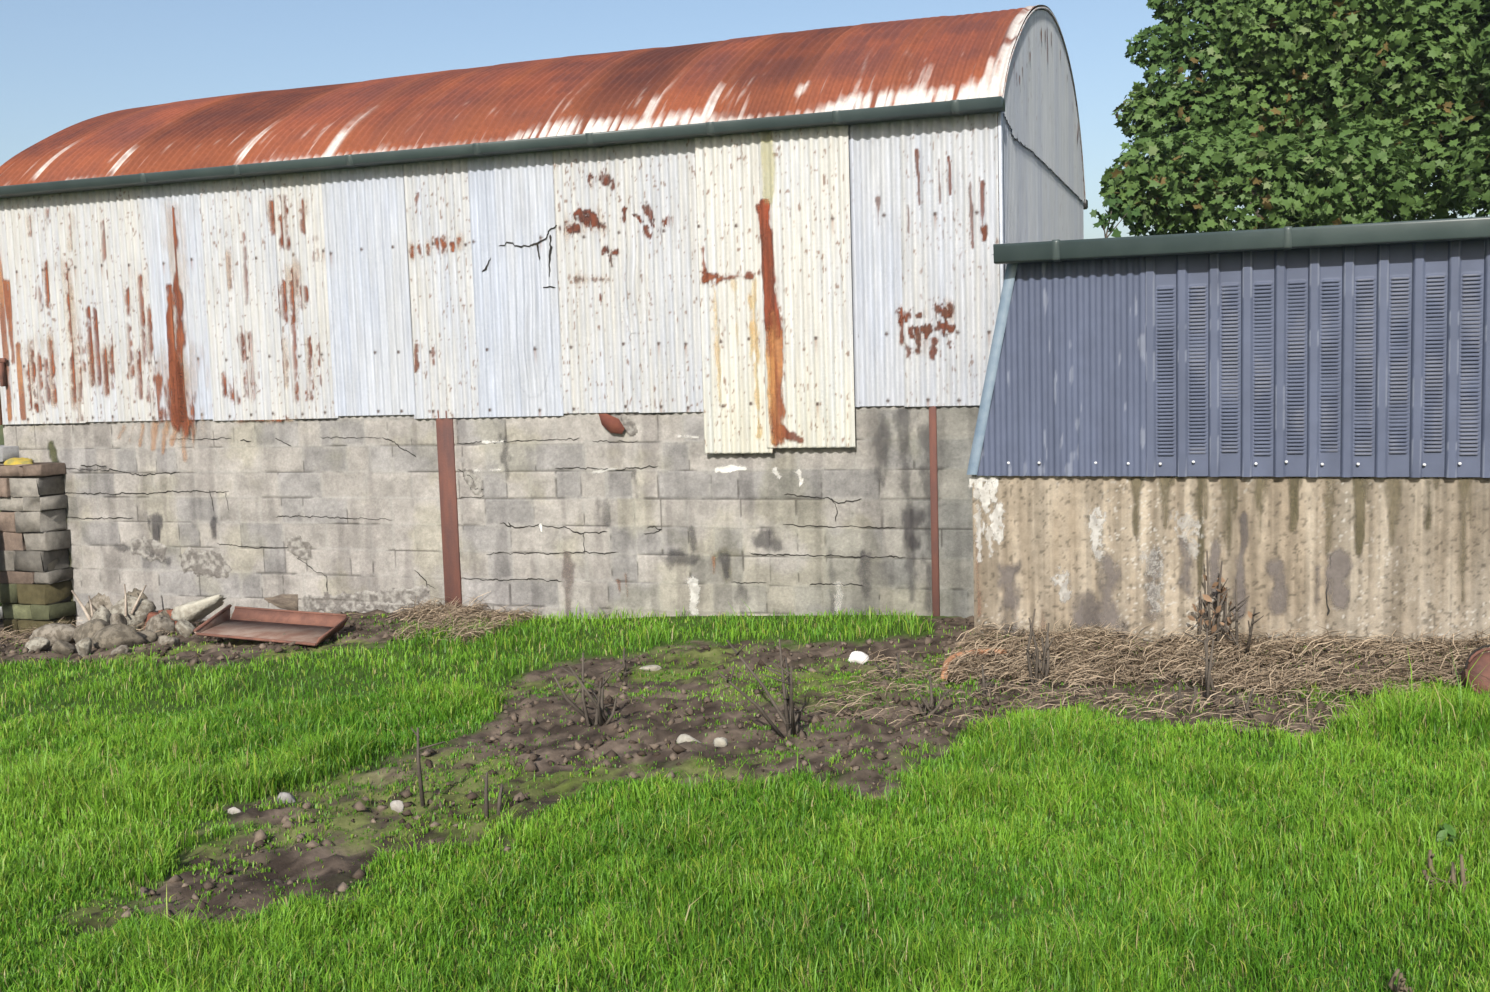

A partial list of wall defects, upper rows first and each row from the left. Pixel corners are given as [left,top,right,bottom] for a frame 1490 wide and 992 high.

corrosion [270,199,305,248]
corrosion [410,238,461,258]
corrosion [0,206,194,453]
corrosion [223,332,288,422]
corrosion [278,269,321,400]
corrosion [702,199,803,446]
leakage [1131,476,1173,535]
leakage [1180,476,1264,619]
leakage [1267,560,1287,614]
leakage [1289,477,1298,531]
leakage [1317,477,1365,608]
leakage [1386,477,1399,536]